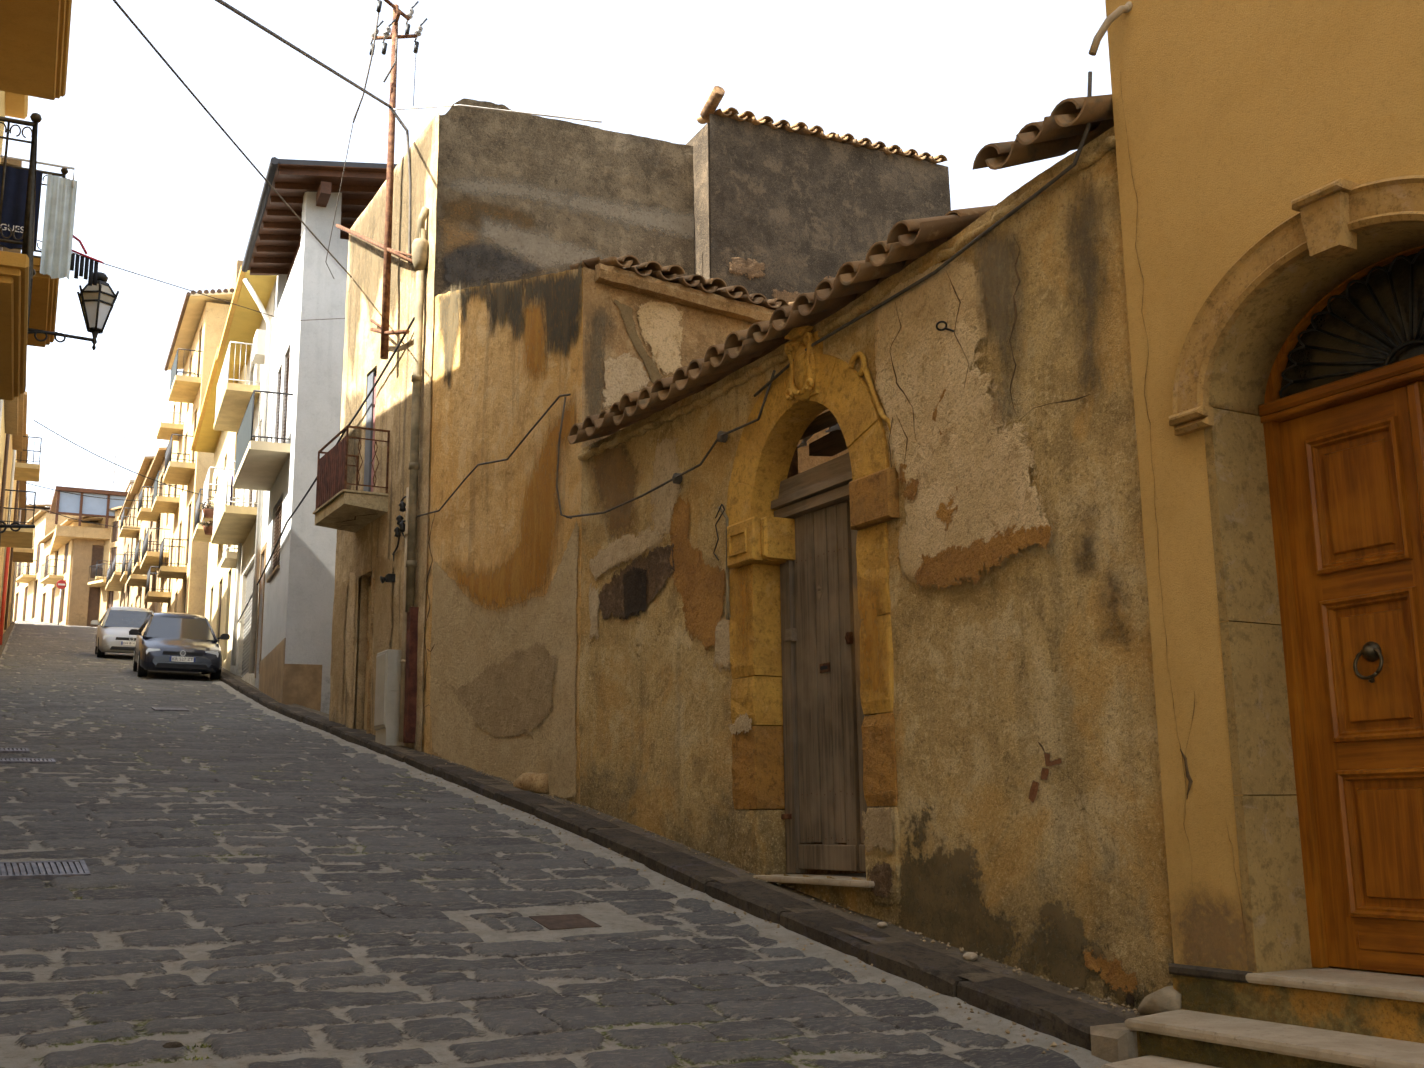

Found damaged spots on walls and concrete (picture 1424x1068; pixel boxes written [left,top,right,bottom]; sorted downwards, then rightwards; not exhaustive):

leakage [343,122,432,490]
leakage [438,196,610,416]
peeling [430,437,731,799]
peeling [874,255,1059,591]
leakage [1069,185,1104,391]
crack [1120,72,1249,950]
leakage [895,803,1254,1012]